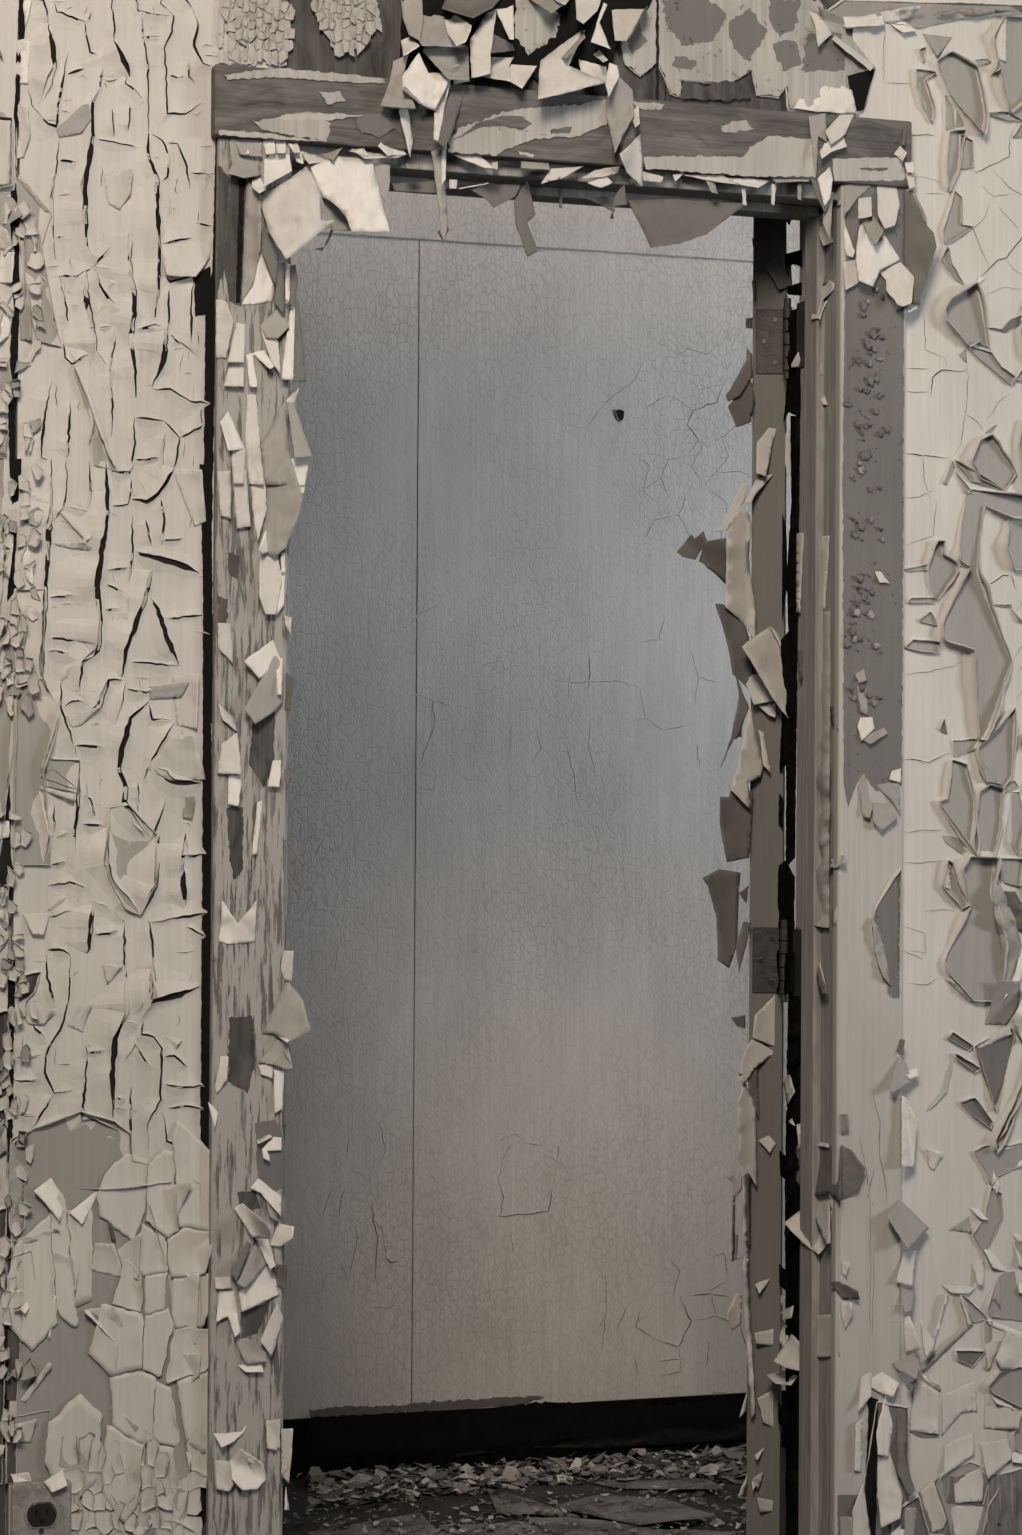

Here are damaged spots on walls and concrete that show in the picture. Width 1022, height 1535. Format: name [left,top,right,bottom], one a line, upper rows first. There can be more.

crack [0,0,219,1169]
peeling [0,0,311,1535]
peeling [215,0,1022,1535]
crack [914,137,1022,297]
crack [979,572,1022,700]